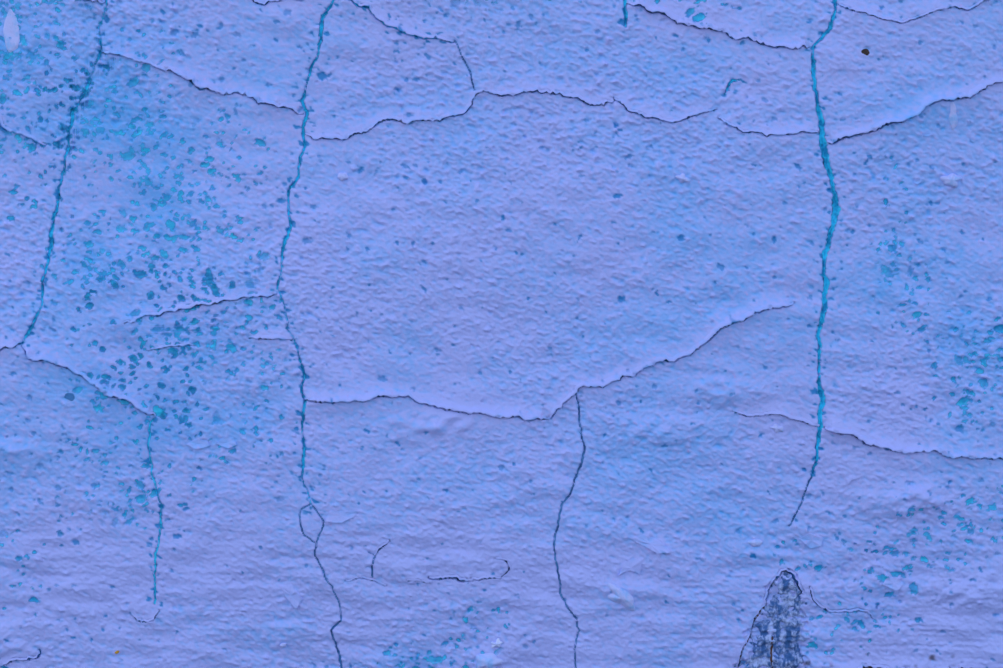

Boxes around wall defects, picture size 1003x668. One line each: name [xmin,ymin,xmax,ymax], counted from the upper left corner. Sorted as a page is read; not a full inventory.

crack [623,0,1003,526]
crack [0,0,794,668]
spalling [734,569,810,668]
crack [735,568,875,668]
crack [858,660,905,668]
peeling [882,577,904,591]